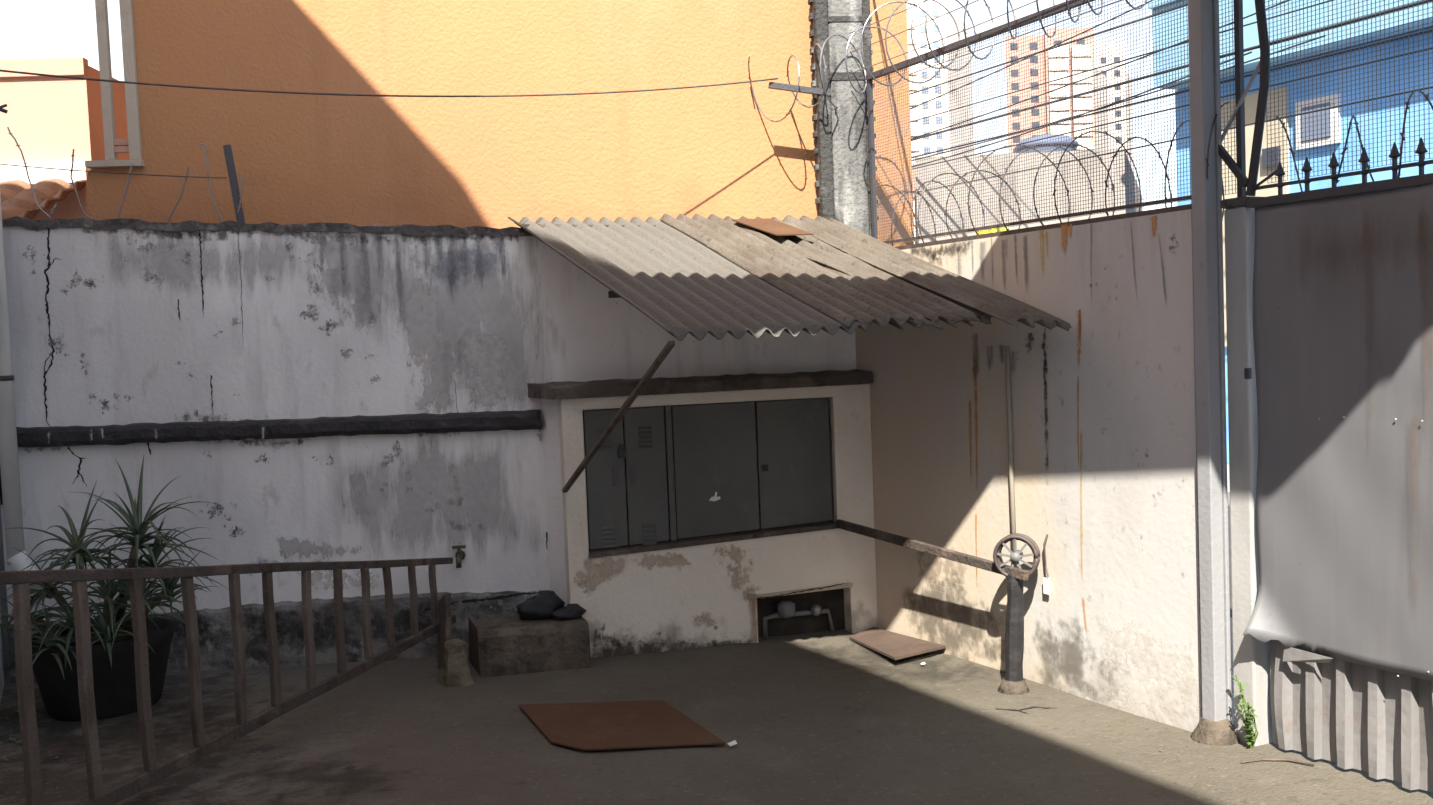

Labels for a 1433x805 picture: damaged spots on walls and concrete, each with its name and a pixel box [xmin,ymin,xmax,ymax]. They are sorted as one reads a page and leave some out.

water stain [113,230,283,285]
rust [1040,224,1072,270]
water stain [306,232,539,398]
crack [43,228,87,486]
rust [969,359,978,474]
flaking render [280,537,377,588]
water stain [909,584,996,660]
water stain [1041,633,1091,691]